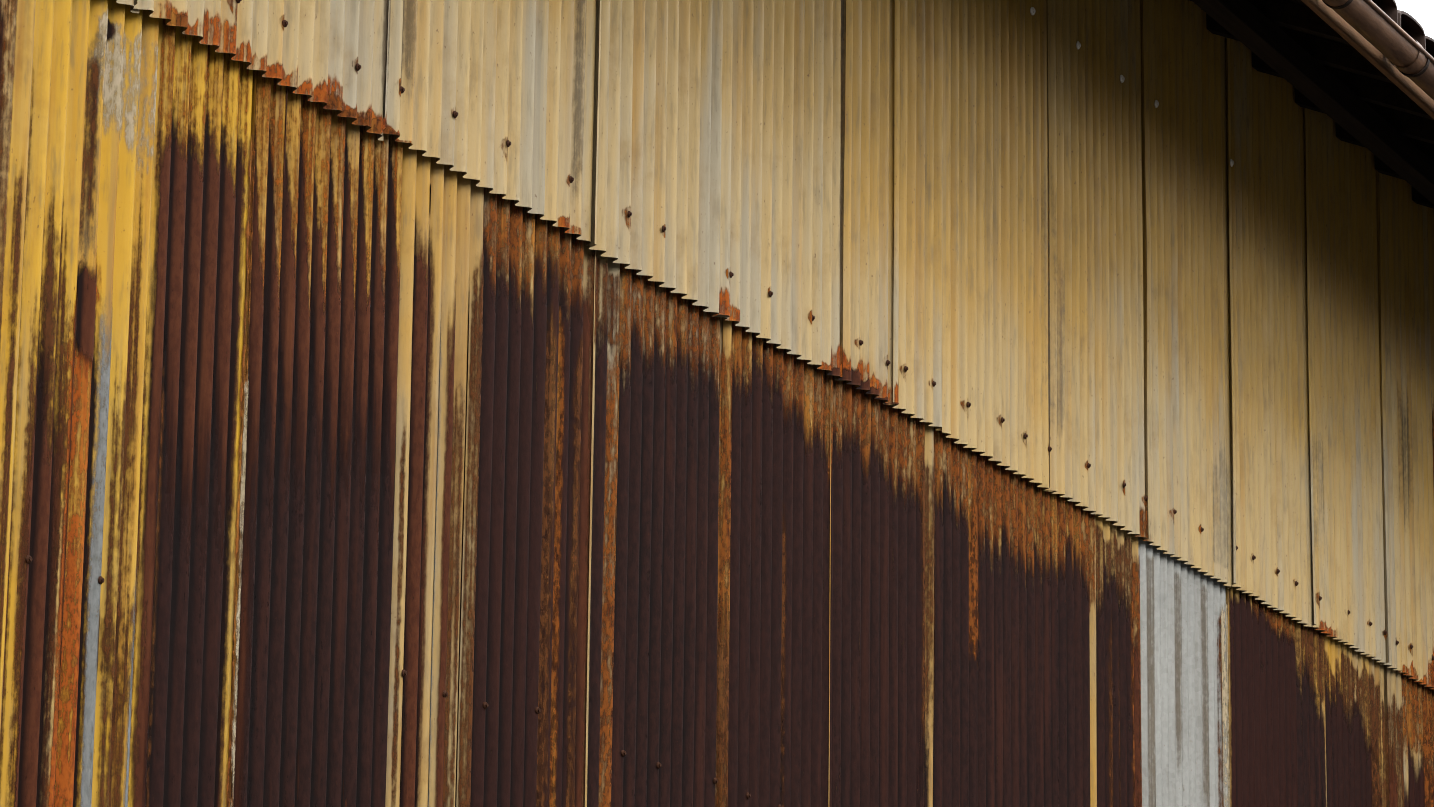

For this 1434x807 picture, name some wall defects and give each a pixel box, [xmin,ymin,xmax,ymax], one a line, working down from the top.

rust [0,0,99,807]
rust [98,0,1149,807]
rust [1217,588,1434,807]